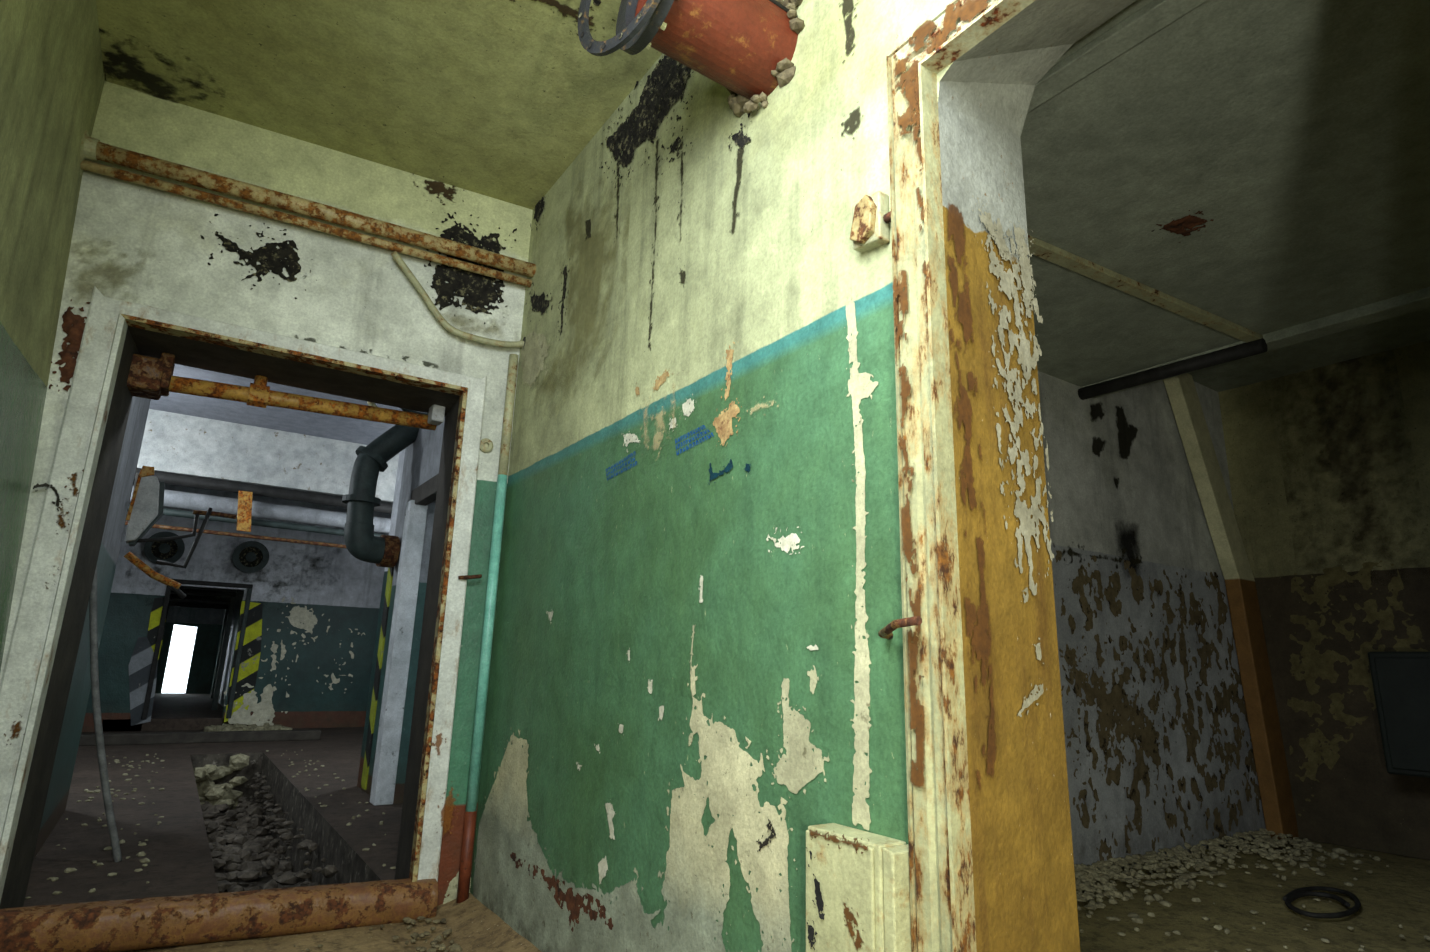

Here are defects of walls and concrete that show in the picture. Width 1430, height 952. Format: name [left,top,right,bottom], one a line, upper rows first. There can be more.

water stain [99,28,215,103]
water stain [532,0,615,35]
water stain [731,147,744,234]
water stain [648,138,660,351]
peeling [669,393,695,431]
peeling [713,342,742,446]
corrosion [892,260,928,787]
corrosion [948,204,997,790]
peeling [972,195,1261,861]
peeling [443,644,830,952]
corrosion [809,830,869,854]
corrosion [843,903,864,951]